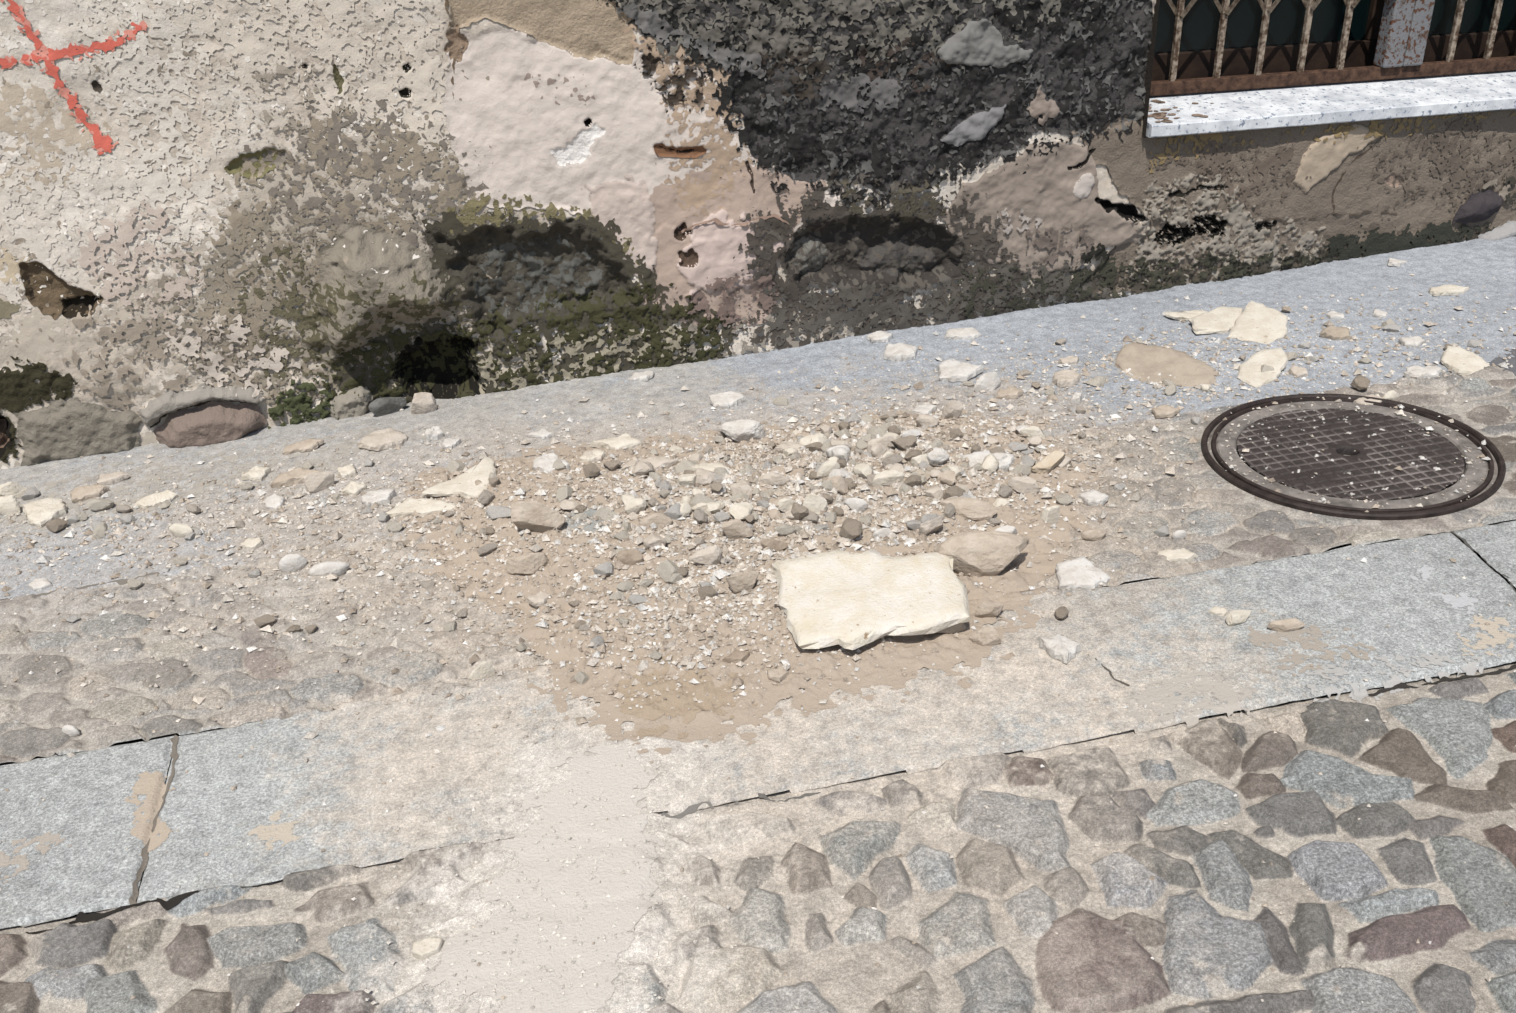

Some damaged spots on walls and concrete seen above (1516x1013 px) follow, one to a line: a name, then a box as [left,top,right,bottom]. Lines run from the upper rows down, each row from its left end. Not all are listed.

leakage [0,0,1391,470]
peeling [0,0,1516,399]
leakage [1357,113,1516,220]
leakage [1411,222,1507,245]
flaking render [0,305,301,466]
flaking render [330,386,373,420]
crack [1450,531,1516,592]
crack [129,735,179,908]